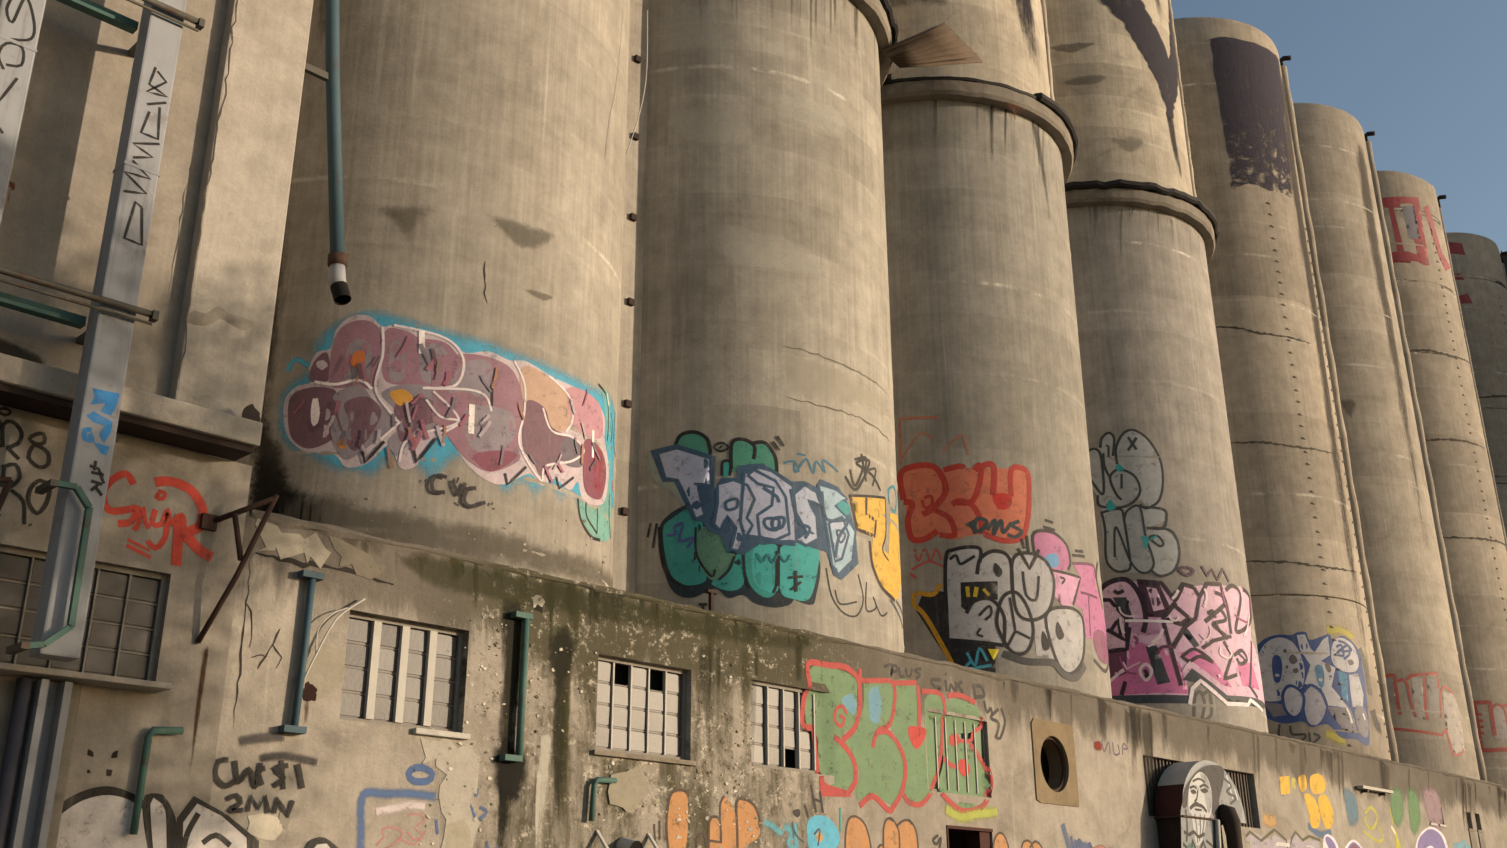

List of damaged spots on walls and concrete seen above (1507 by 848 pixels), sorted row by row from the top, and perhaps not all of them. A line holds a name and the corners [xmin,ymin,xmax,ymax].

crack [179,0,238,379]
spalling [255,519,394,585]
damp [251,418,620,846]